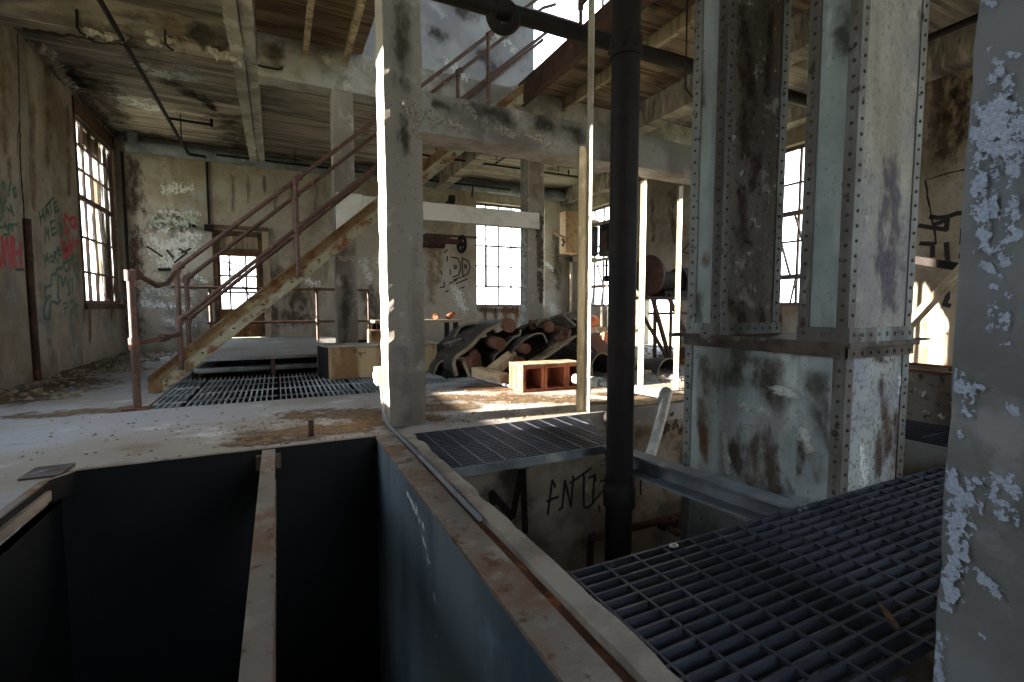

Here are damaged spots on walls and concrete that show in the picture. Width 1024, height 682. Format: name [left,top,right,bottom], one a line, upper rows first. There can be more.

damp [189,24,223,51]
damp [63,63,186,143]
damp [127,62,246,150]
damp [923,74,972,161]
peeling [968,46,1024,346]
spalling [633,419,683,464]
corrosion [728,431,783,495]
corrosion [806,374,827,439]
corrosion [875,379,898,477]
peeling [954,368,994,418]
peeling [894,463,1023,632]
spalling [891,627,950,682]